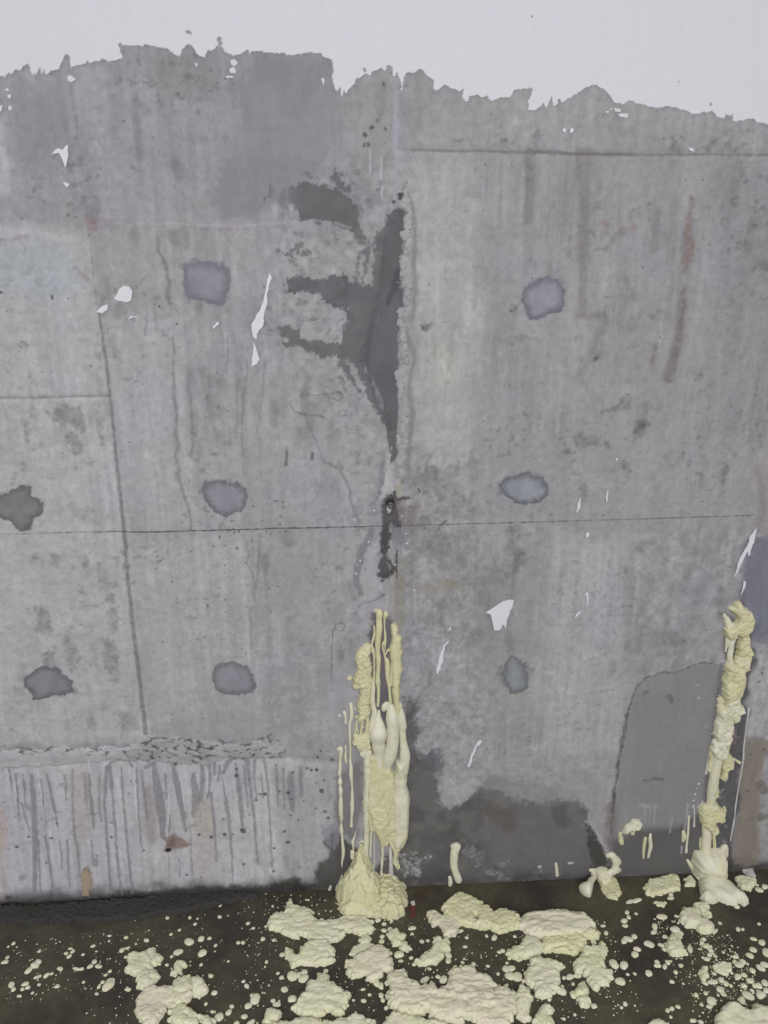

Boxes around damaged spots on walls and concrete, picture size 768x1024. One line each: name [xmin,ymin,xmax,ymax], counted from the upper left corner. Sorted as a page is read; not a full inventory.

damp [214,53,408,424]
damp [9,757,303,896]
damp [304,832,358,891]
damp [375,664,723,887]